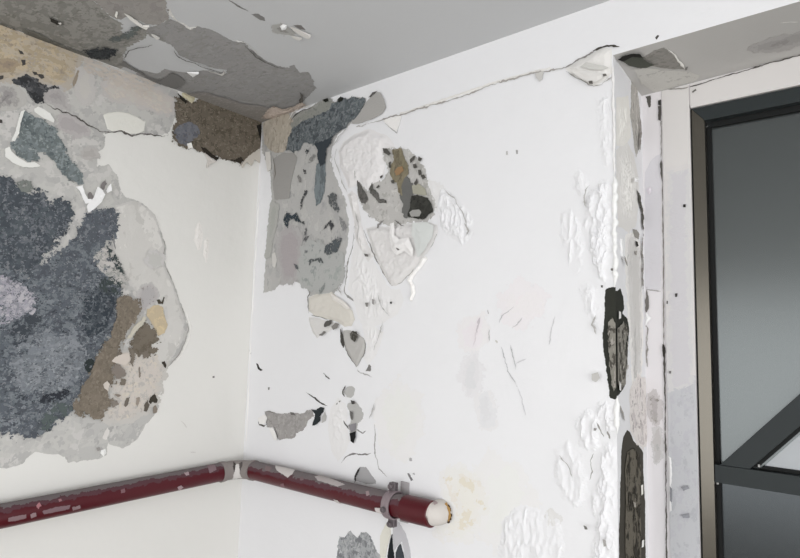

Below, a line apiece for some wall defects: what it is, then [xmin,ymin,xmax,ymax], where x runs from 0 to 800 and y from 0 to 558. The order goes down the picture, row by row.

spalling [640,48,688,71]
crack [48,105,168,137]
spalling [0,0,376,293]
crack [329,45,619,192]
spalling [0,229,189,469]
peeling [295,279,371,371]
spalling [592,285,629,399]
spalling [258,409,314,440]
spalling [342,386,364,443]
spalling [354,467,376,484]
spalling [337,522,411,558]
spalling [619,430,646,558]